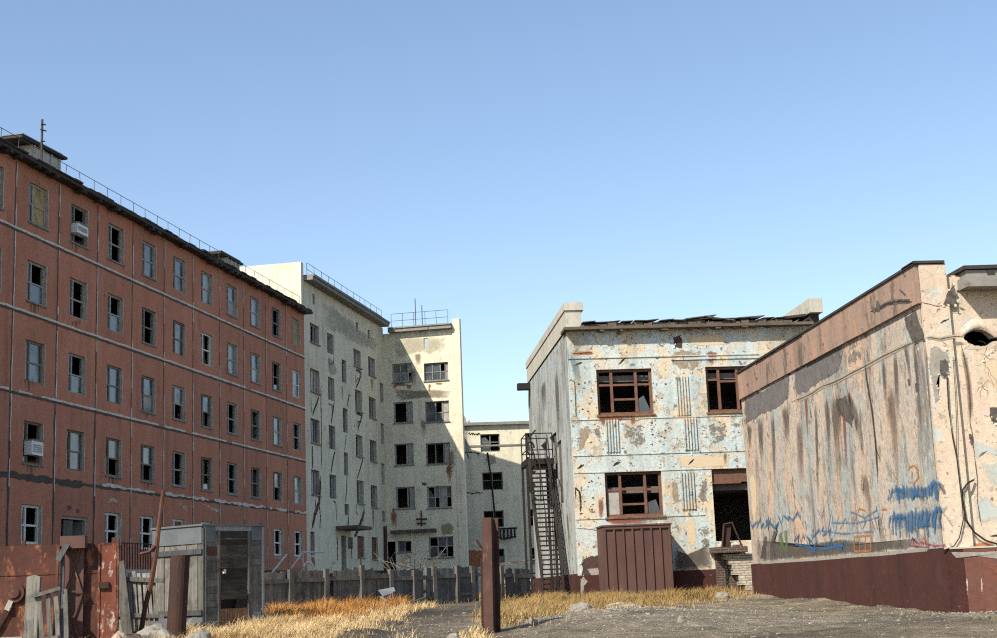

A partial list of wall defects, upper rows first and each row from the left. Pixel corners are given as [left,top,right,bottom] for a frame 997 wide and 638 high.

peeling [665,331,730,374]
leakage [883,347,929,396]
peeling [575,381,603,452]
peeling [621,338,861,509]
leakage [748,410,789,466]
leakage [815,397,862,460]
crack [792,299,997,540]
peeling [468,550,483,570]
peeling [687,519,712,548]
peeling [951,541,997,559]